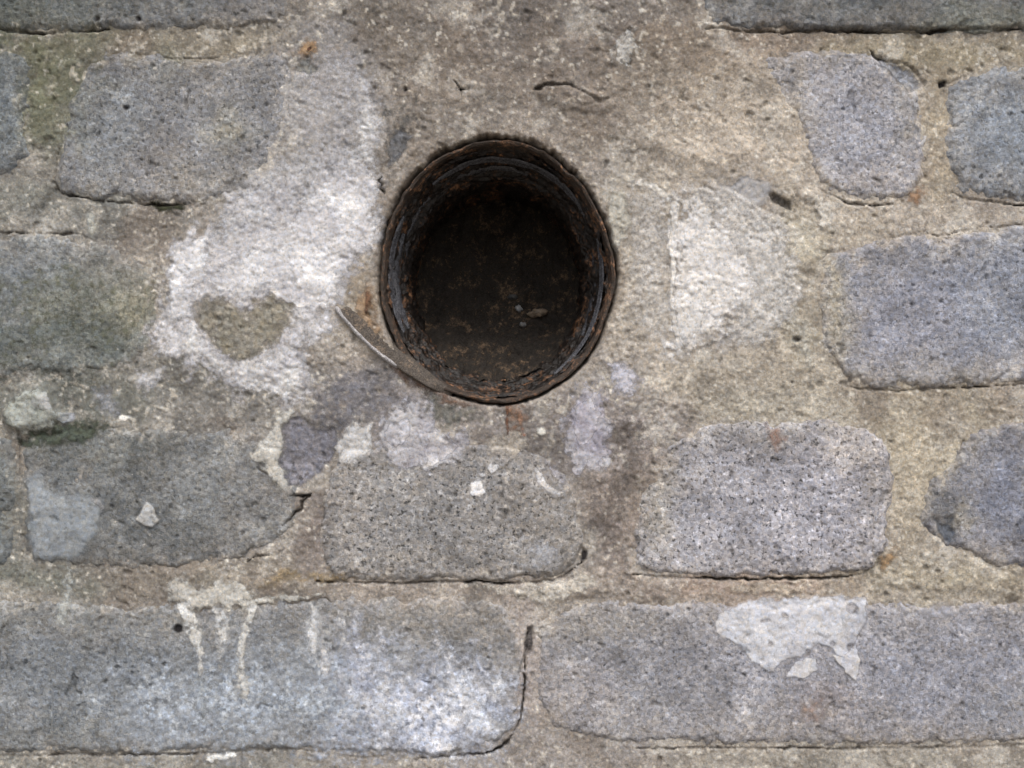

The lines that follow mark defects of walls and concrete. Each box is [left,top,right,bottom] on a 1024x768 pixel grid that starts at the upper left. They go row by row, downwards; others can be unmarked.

crack [535,83,596,99]
peeling [166,48,412,398]
corrosion [390,366,468,407]
water stain [108,572,524,768]
crack [472,659,526,754]
peeling [715,595,867,681]